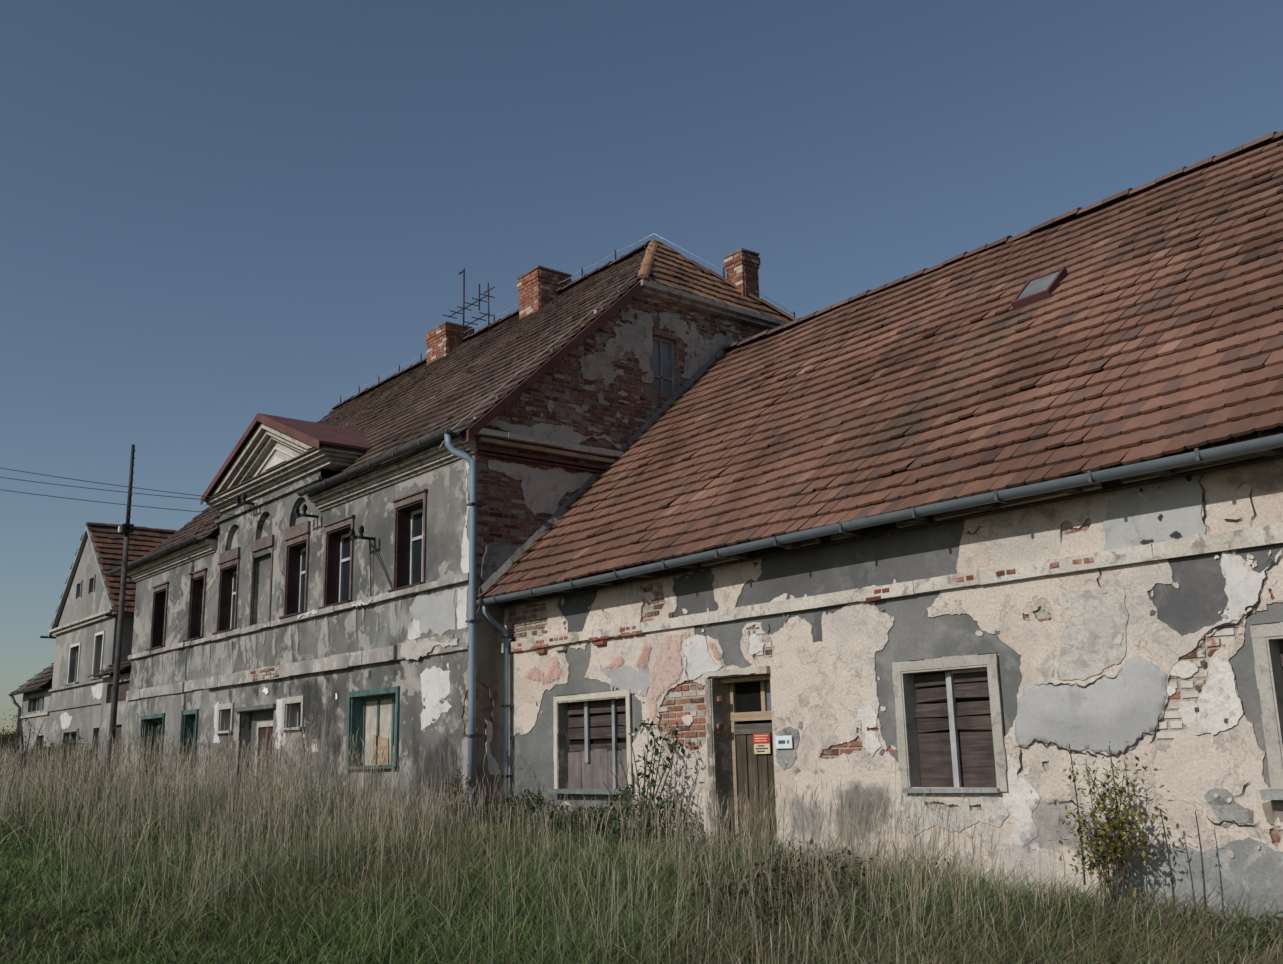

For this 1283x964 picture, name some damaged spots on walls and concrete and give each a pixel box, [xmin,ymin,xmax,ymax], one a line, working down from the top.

peeling [511,355,656,439]
flaking render [420,520,1022,819]
spalling [900,755,1044,851]
flaking render [1148,543,1283,842]